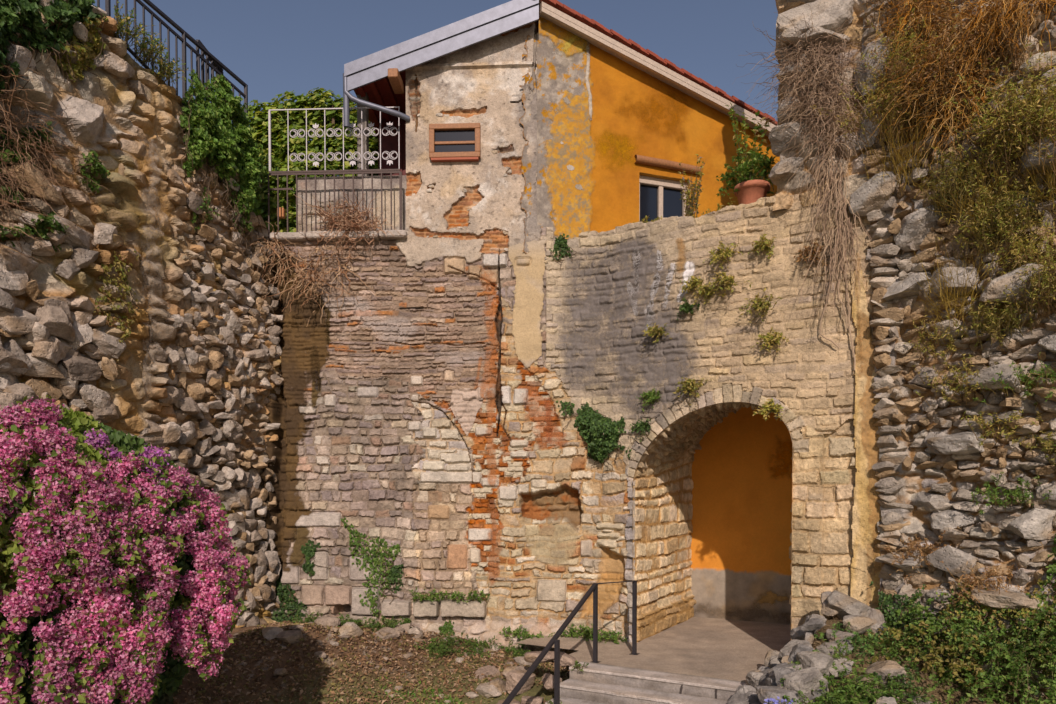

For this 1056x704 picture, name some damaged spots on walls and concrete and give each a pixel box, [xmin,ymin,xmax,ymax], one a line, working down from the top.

flaking render [405,169,436,196]
peeling [409,21,590,368]
crack [394,260,512,441]
flaking render [448,387,483,436]